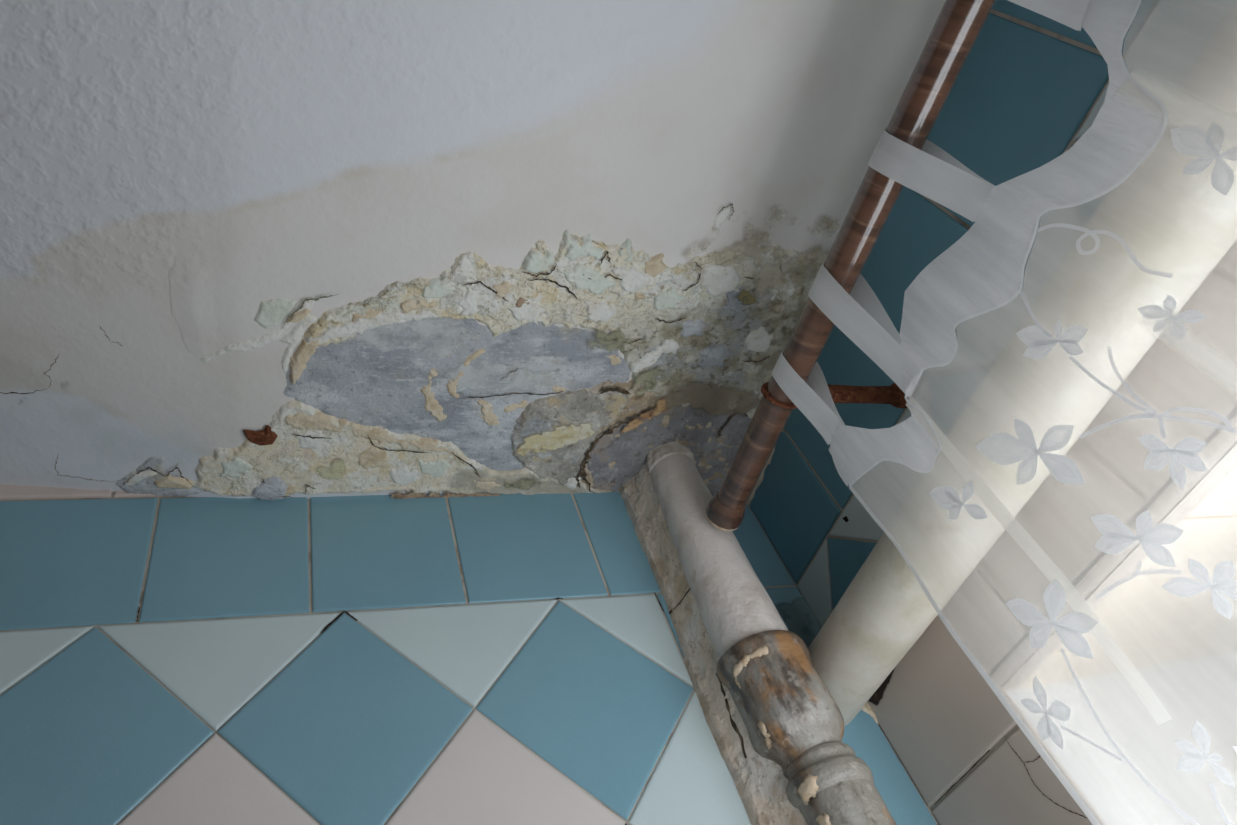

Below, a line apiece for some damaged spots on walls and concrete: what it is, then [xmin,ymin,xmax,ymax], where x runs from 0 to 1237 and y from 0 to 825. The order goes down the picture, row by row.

leakage [0,0,946,496]
crack [0,355,59,398]
flaking render [116,229,822,501]
corrosion [243,425,277,446]
crack [576,387,657,493]
crack [934,734,1087,818]